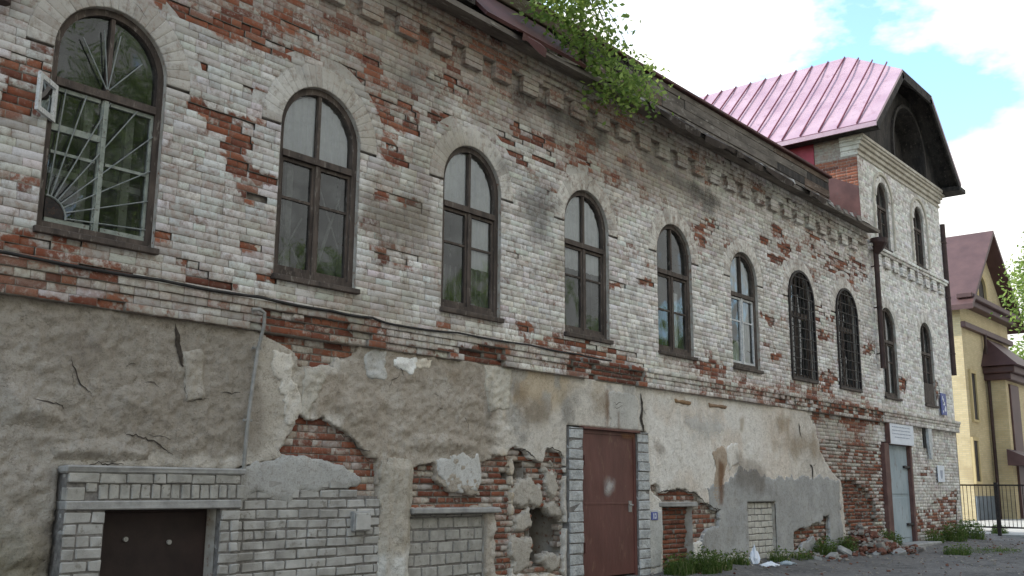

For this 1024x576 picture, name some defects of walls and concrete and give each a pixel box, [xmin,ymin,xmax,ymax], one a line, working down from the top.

crack [33,356,90,409]
crack [126,434,182,454]
crack [175,323,240,402]
spalling [246,309,374,496]
spalling [411,447,563,576]
crack [638,393,646,432]
spalling [650,443,739,543]
spalling [793,516,826,550]
spalling [775,369,886,538]